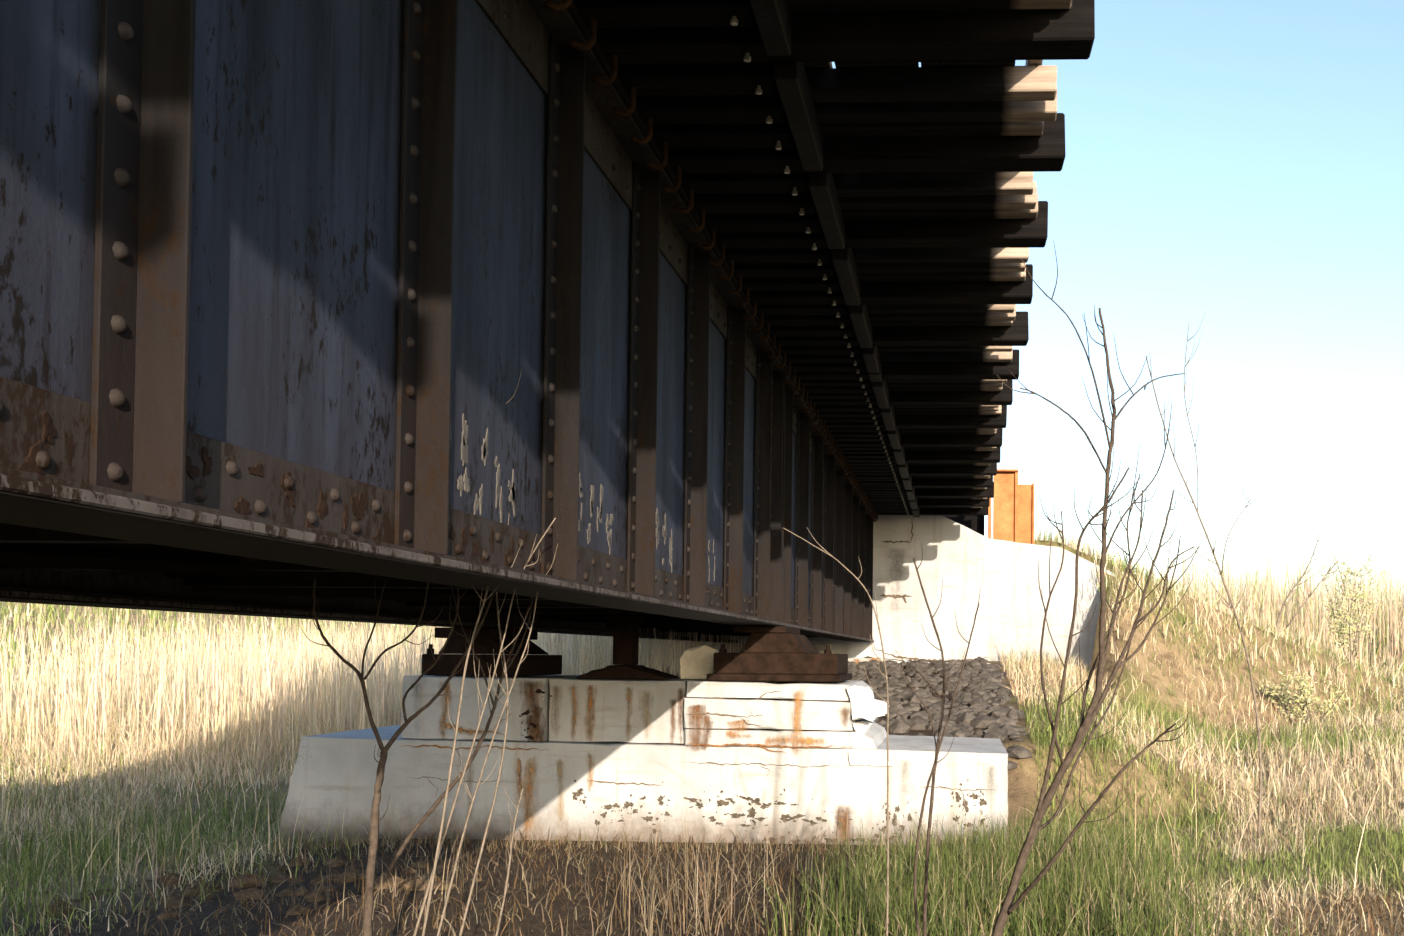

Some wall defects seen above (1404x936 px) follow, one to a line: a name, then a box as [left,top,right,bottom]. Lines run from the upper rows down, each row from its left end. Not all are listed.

rust [16,410,57,475]
rust [185,446,213,479]
peeling [450,414,515,523]
rust [280,470,368,530]
rust [524,682,544,742]
rust [572,686,594,738]
rust [671,690,710,749]
rust [766,692,823,745]
spalling [847,685,894,766]
rust [517,760,534,827]
peeling [572,780,917,845]